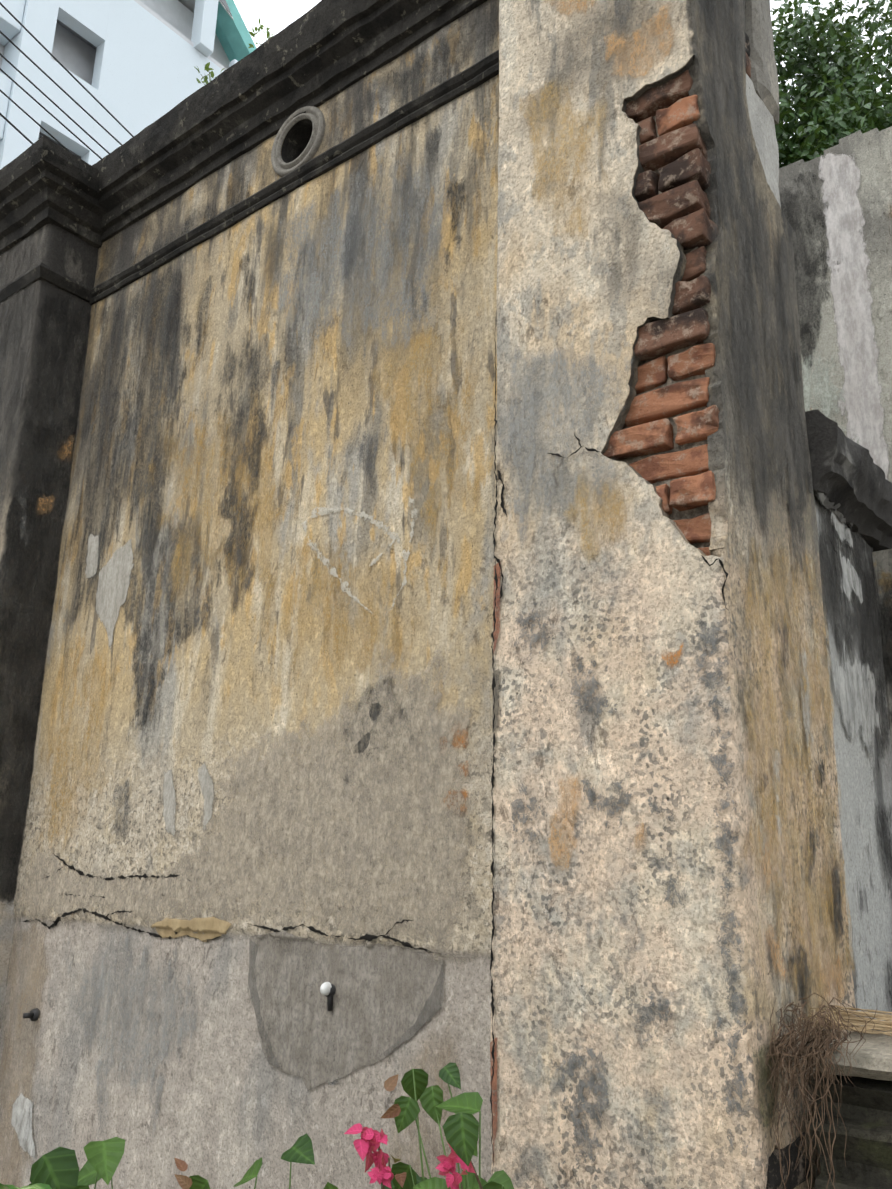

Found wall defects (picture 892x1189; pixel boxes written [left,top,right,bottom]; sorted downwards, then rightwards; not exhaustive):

leakage [426,129,440,162]
leakage [279,162,465,350]
spalling [603,70,720,556]
leakage [699,0,892,768]
leakage [0,241,280,902]
mould [343,678,421,764]
crack [490,323,507,1171]
crack [1,850,221,942]
crack [246,919,446,955]
leakage [807,830,844,937]
leakage [877,805,892,885]